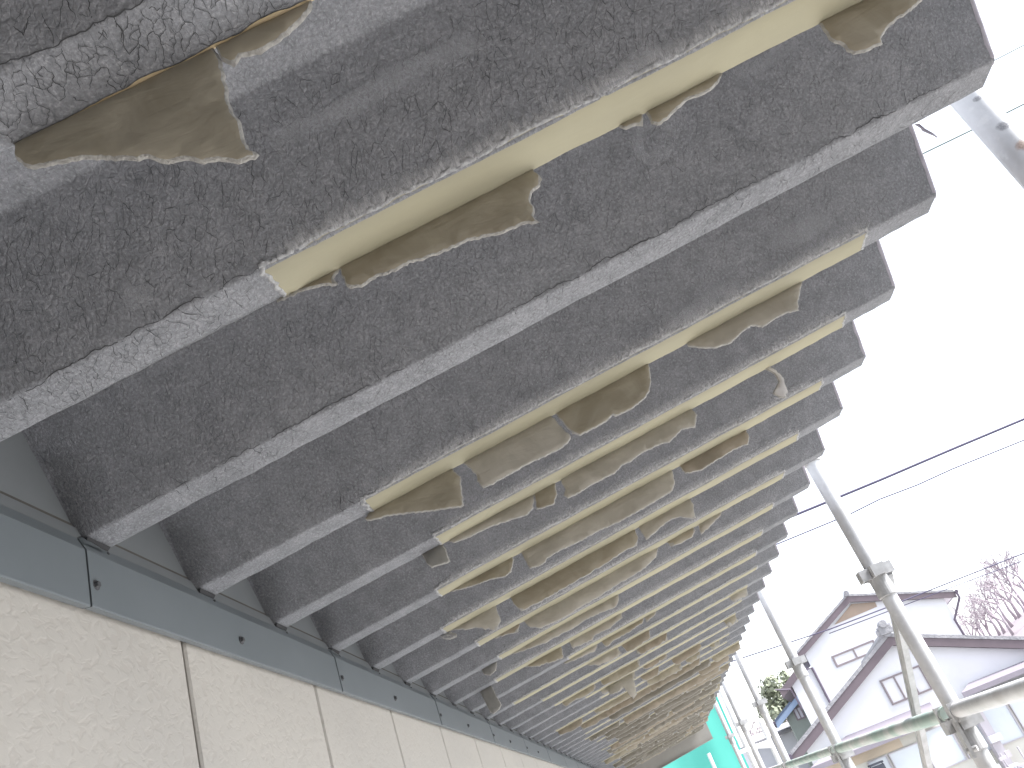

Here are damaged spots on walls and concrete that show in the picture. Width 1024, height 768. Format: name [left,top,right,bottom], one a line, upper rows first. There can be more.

peeling [14,0,314,170]
crack [0,0,958,520]
peeling [258,0,923,303]
peeling [360,228,869,768]